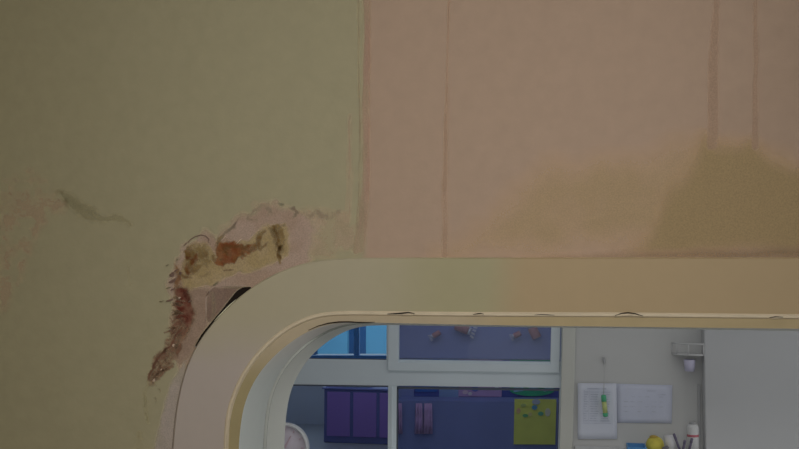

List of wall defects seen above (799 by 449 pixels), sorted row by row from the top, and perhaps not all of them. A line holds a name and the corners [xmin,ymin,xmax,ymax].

leakage [490,0,799,257]
rust [148,224,289,381]
crack [195,287,251,346]
peeling [155,201,353,449]